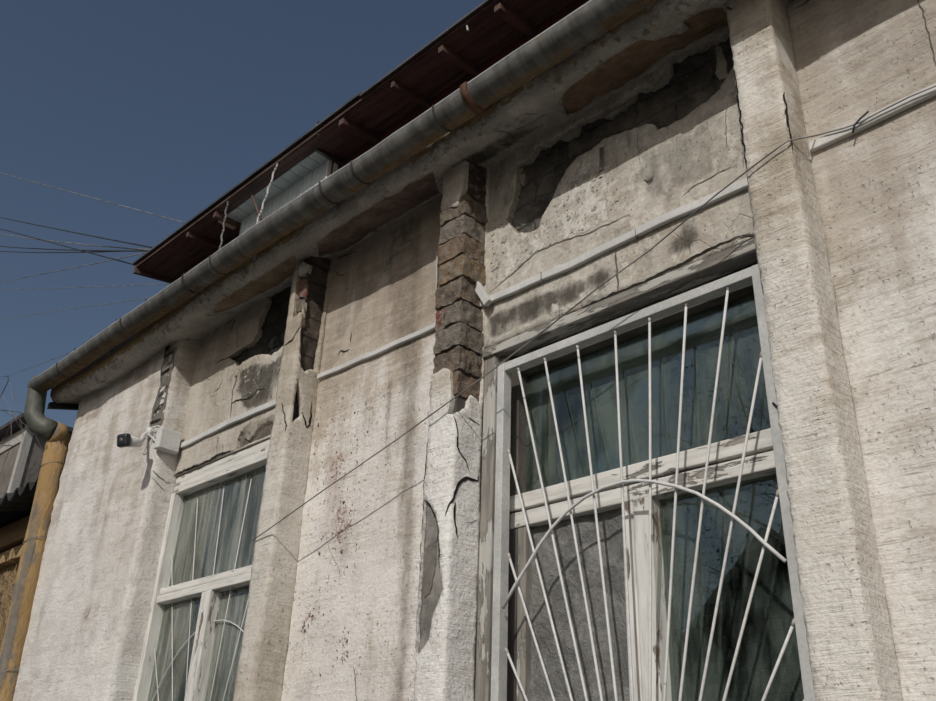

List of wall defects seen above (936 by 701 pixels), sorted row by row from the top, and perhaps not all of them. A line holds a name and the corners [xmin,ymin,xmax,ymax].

crack [918,0,936,65]
crack [684,71,747,195]
spalling [214,172,439,396]
water stain [490,271,607,335]
crack [490,214,629,292]
flaking render [429,7,734,414]
flaking render [149,345,177,428]
crack [418,416,479,594]
spalling [418,502,443,653]